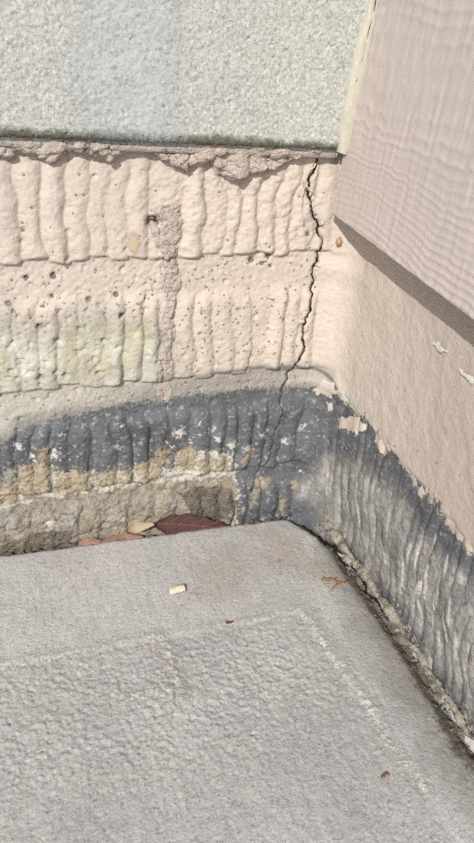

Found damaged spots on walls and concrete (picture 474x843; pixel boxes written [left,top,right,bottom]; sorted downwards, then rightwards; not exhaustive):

crack [251,158,324,491]
peeling [313,379,338,411]
peeling [339,414,368,436]
peeling [374,438,391,456]
spalling [249,475,274,509]
spalling [0,476,239,556]